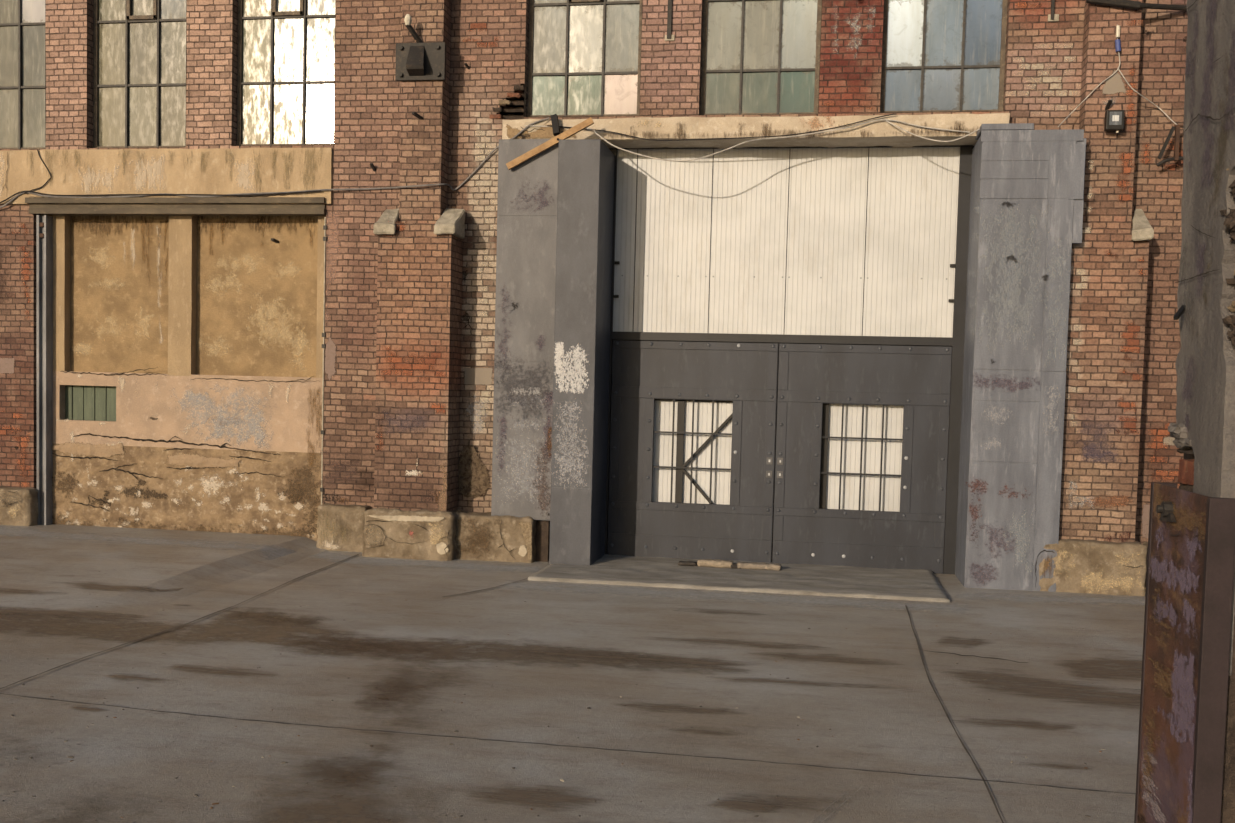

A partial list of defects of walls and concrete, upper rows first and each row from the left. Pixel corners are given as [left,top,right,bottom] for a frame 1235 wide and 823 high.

spalling [489,85,576,139]
spalling [1220,168,1235,243]
damp [70,215,168,272]
spalling [1222,270,1235,346]
crack [52,433,281,512]
peeling [60,465,303,531]
rust [966,479,1026,584]